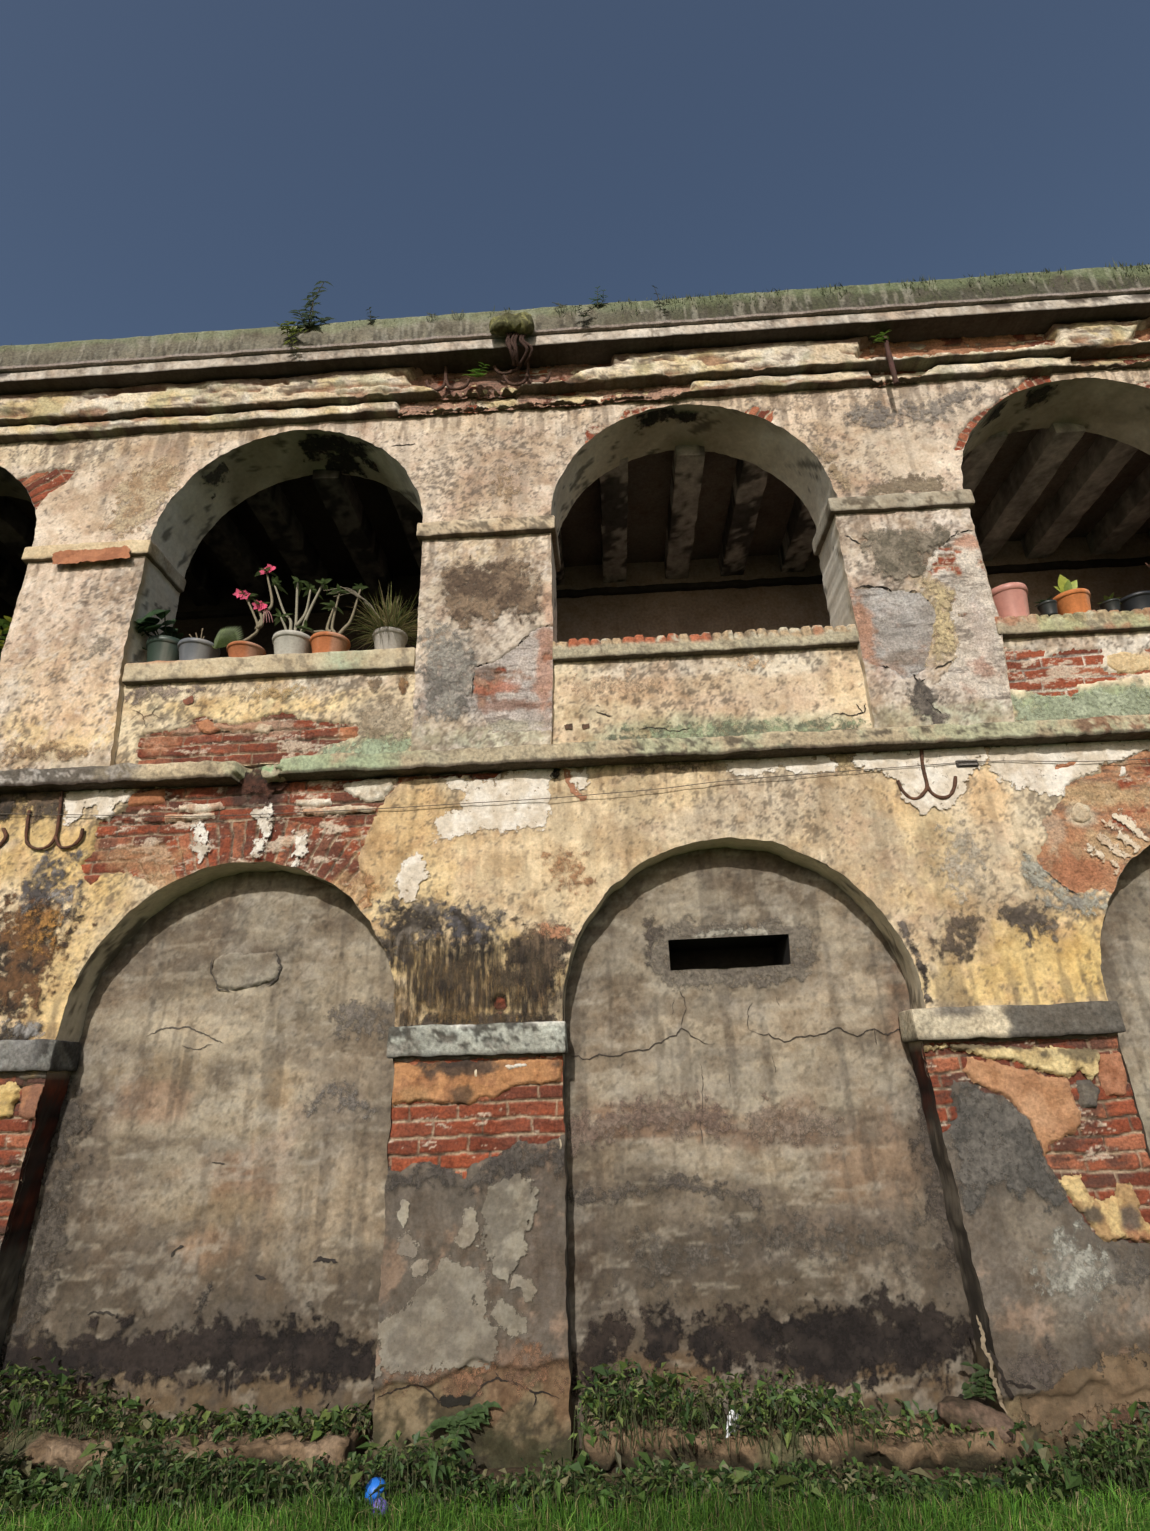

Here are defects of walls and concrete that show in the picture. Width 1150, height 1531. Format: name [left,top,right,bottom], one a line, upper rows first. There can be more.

flaking render [849,531,1150,701]
flaking render [136,695,359,765]
water stain [15,849,84,922]
flaking render [63,767,591,911]
flaking render [722,739,1150,894]
water stain [328,892,575,1041]
crack [747,997,900,1072]
flaking render [0,1076,46,1242]
flaking render [387,1055,565,1179]
flaking render [921,1036,1150,1318]
flaking render [374,1173,539,1379]
crack [377,1372,558,1407]